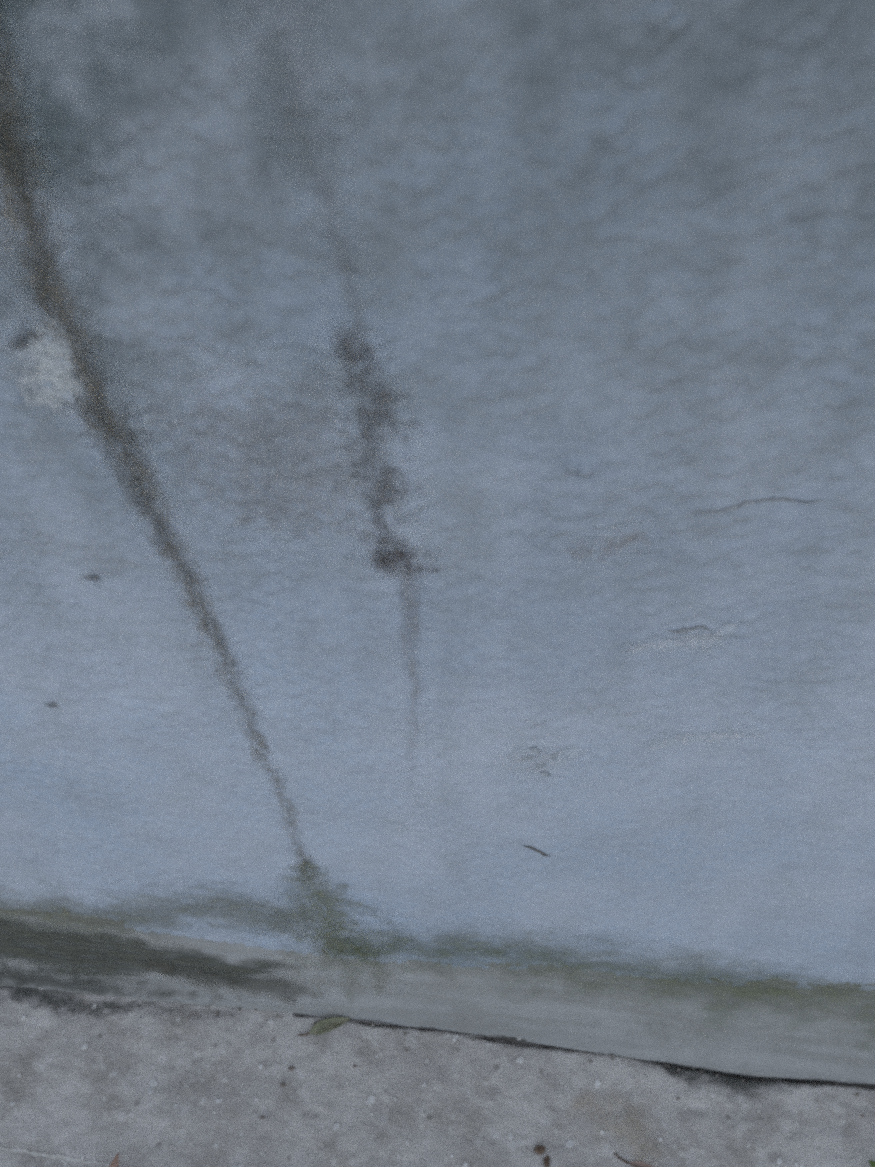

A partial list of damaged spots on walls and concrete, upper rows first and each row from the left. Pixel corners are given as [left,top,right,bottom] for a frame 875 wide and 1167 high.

damp [0,920,289,1014]